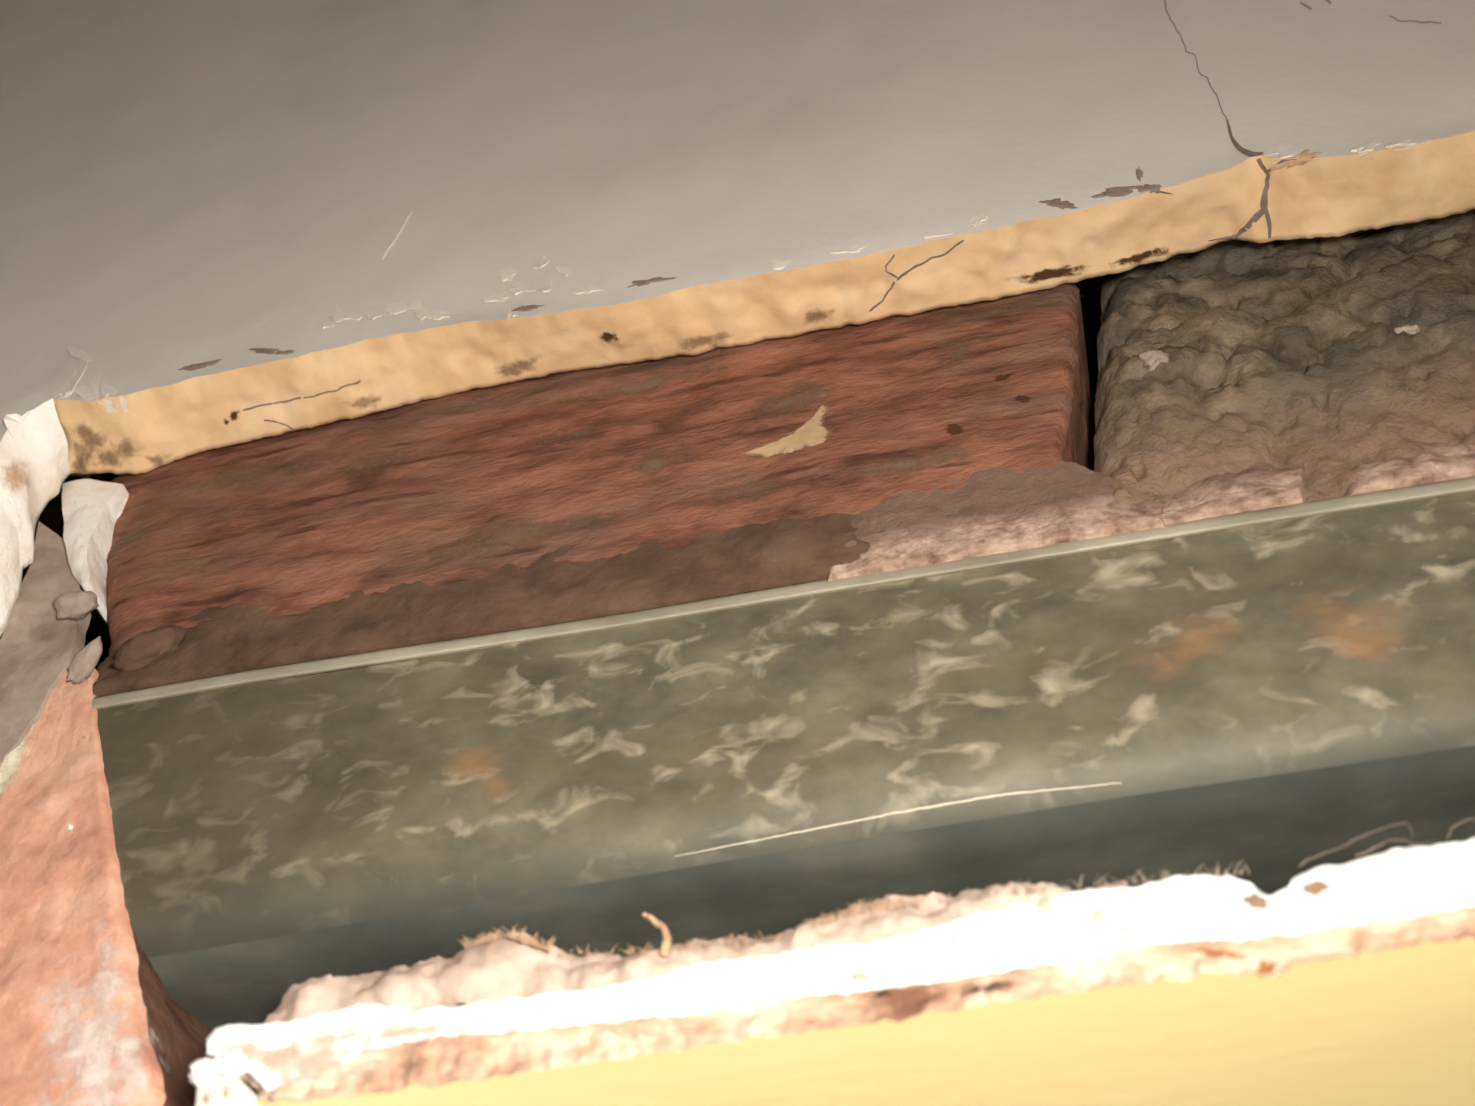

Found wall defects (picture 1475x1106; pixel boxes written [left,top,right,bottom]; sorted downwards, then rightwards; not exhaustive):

crack [1164,0,1314,241]
peeling [1264,144,1322,171]
peeling [1350,138,1416,156]
peeling [1038,167,1172,209]
peeling [482,253,602,320]
peeling [627,277,678,288]
crack [869,240,964,312]
peeling [322,297,450,328]
peeling [178,359,222,371]
spalling [946,424,963,435]